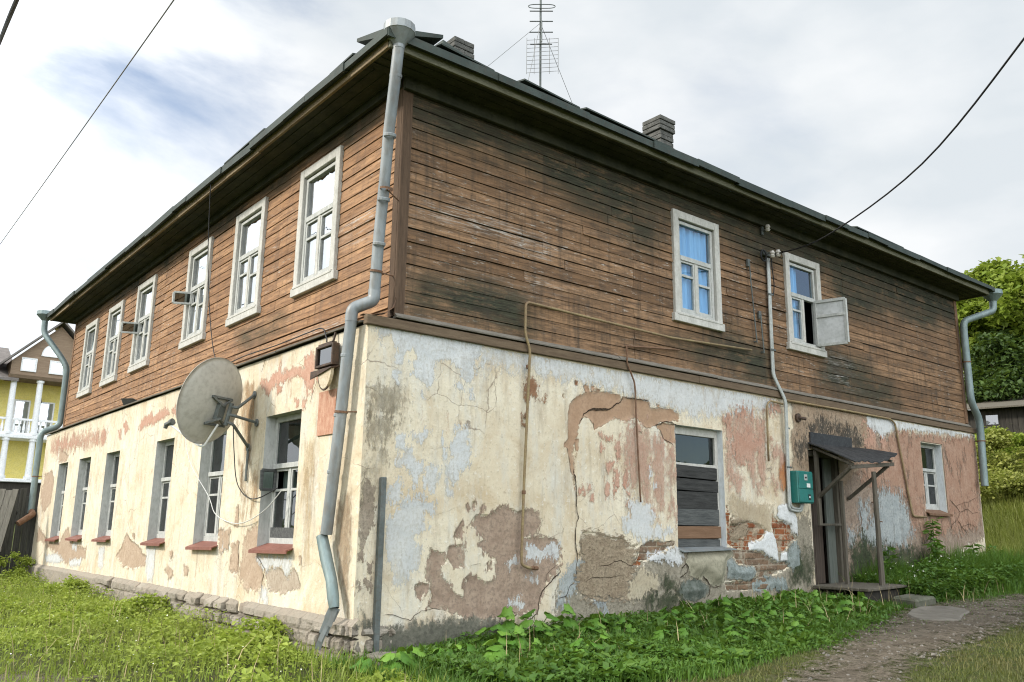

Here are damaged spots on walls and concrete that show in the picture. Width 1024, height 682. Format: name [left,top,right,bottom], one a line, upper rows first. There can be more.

flaking render [35,404,176,569]
peeling [164,550,188,579]
flaking render [218,506,301,595]
damp [367,382,397,443]
damp [335,472,515,652]
flaking render [356,423,565,622]
crack [500,469,719,620]
flaking render [563,381,684,608]
crack [579,390,679,444]
peeling [722,398,798,594]
damp [794,413,868,468]